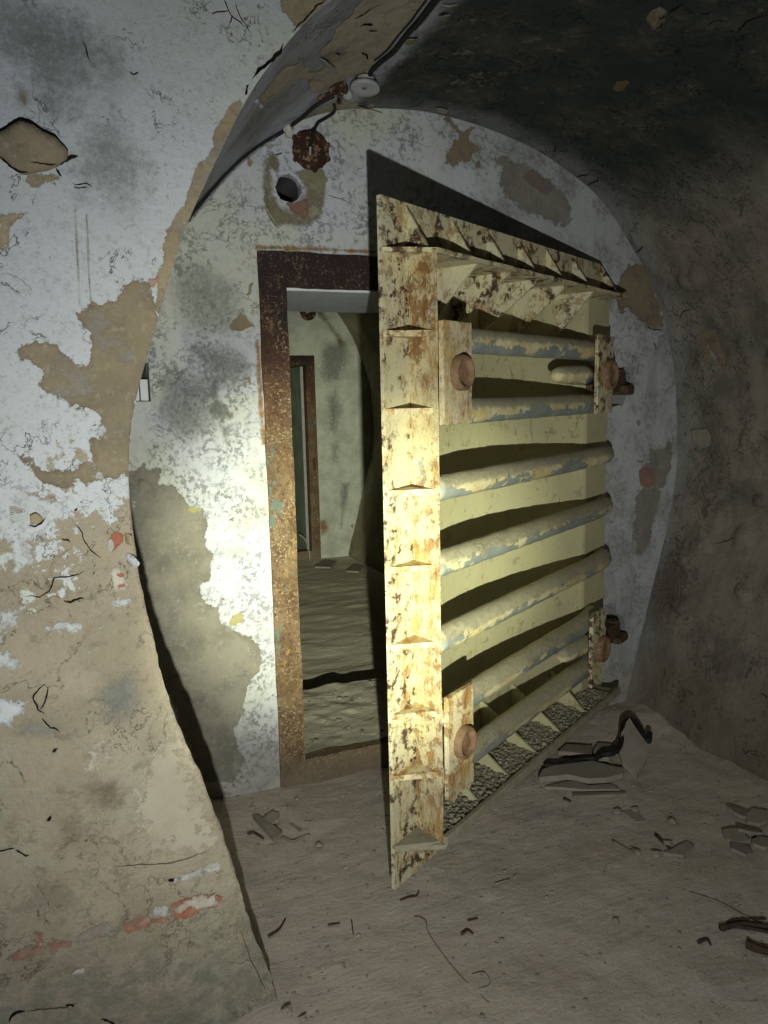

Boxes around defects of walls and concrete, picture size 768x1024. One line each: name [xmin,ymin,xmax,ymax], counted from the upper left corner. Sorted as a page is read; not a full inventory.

peeling [280,0,328,28]
peeling [302,0,425,88]
flaking render [0,121,78,188]
peeling [247,153,328,229]
peeling [436,108,572,229]
peeling [616,261,664,331]
rust [256,343,265,444]
peeling [15,100,263,783]
crack [28,508,99,603]
crack [32,684,60,733]
flaking render [123,893,222,934]